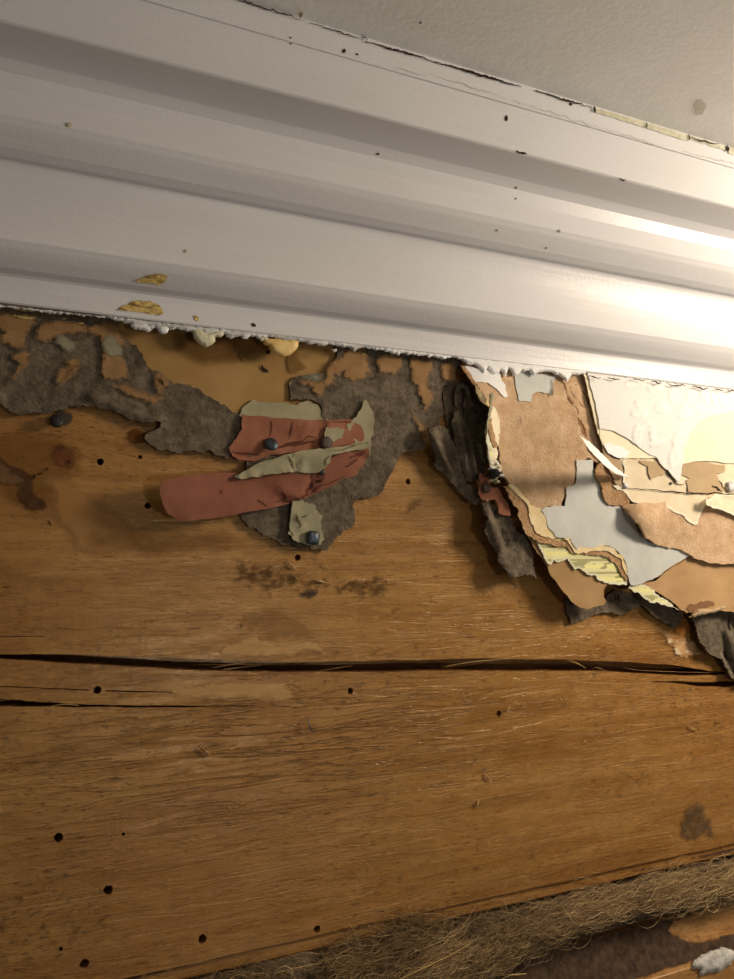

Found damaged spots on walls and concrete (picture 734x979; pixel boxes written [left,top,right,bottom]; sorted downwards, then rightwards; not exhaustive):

crack [239,0,662,146]
peeling [0,300,588,409]
crack [0,636,734,708]